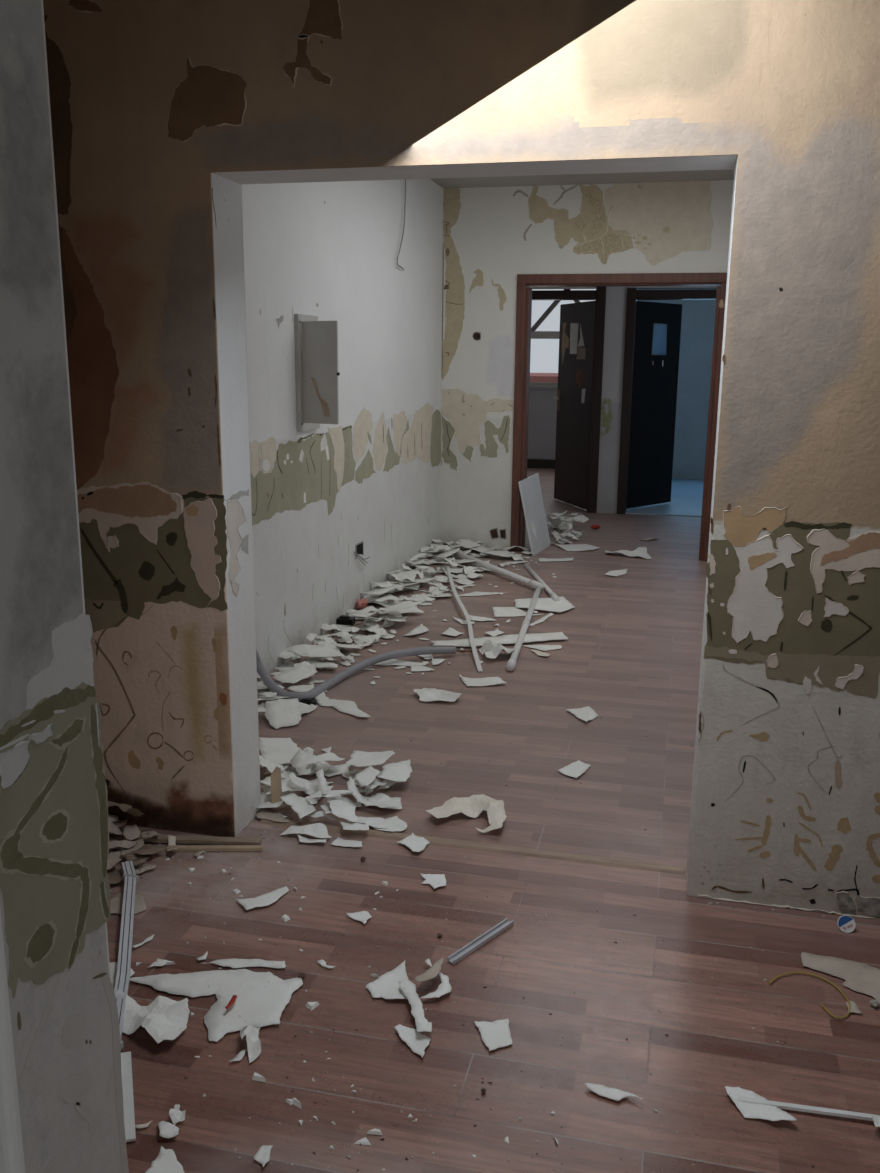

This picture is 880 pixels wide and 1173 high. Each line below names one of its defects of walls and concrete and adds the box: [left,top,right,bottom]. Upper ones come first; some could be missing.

peeling [283,0,343,87]
peeling [167,57,247,142]
flaking render [513,181,714,266]
peeling [442,188,507,416]
peeling [321,434,330,460]
flaking render [708,504,787,606]
peeling [799,598,849,626]
peeling [848,571,865,585]
peeling [767,654,778,668]
peeling [803,665,864,694]
peeling [0,710,66,788]